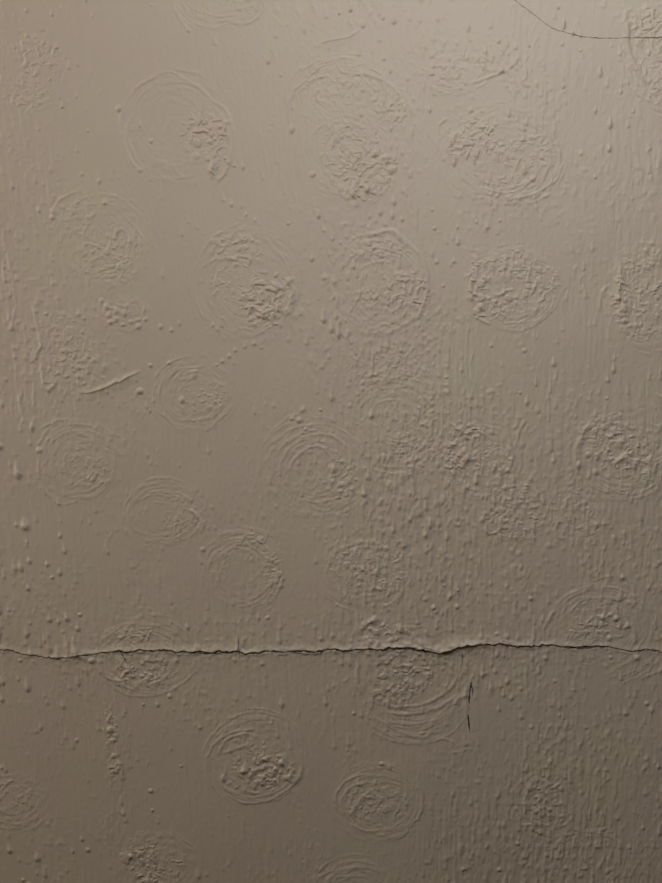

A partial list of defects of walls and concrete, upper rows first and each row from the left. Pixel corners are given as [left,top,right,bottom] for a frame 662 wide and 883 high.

crack [0,629,662,732]